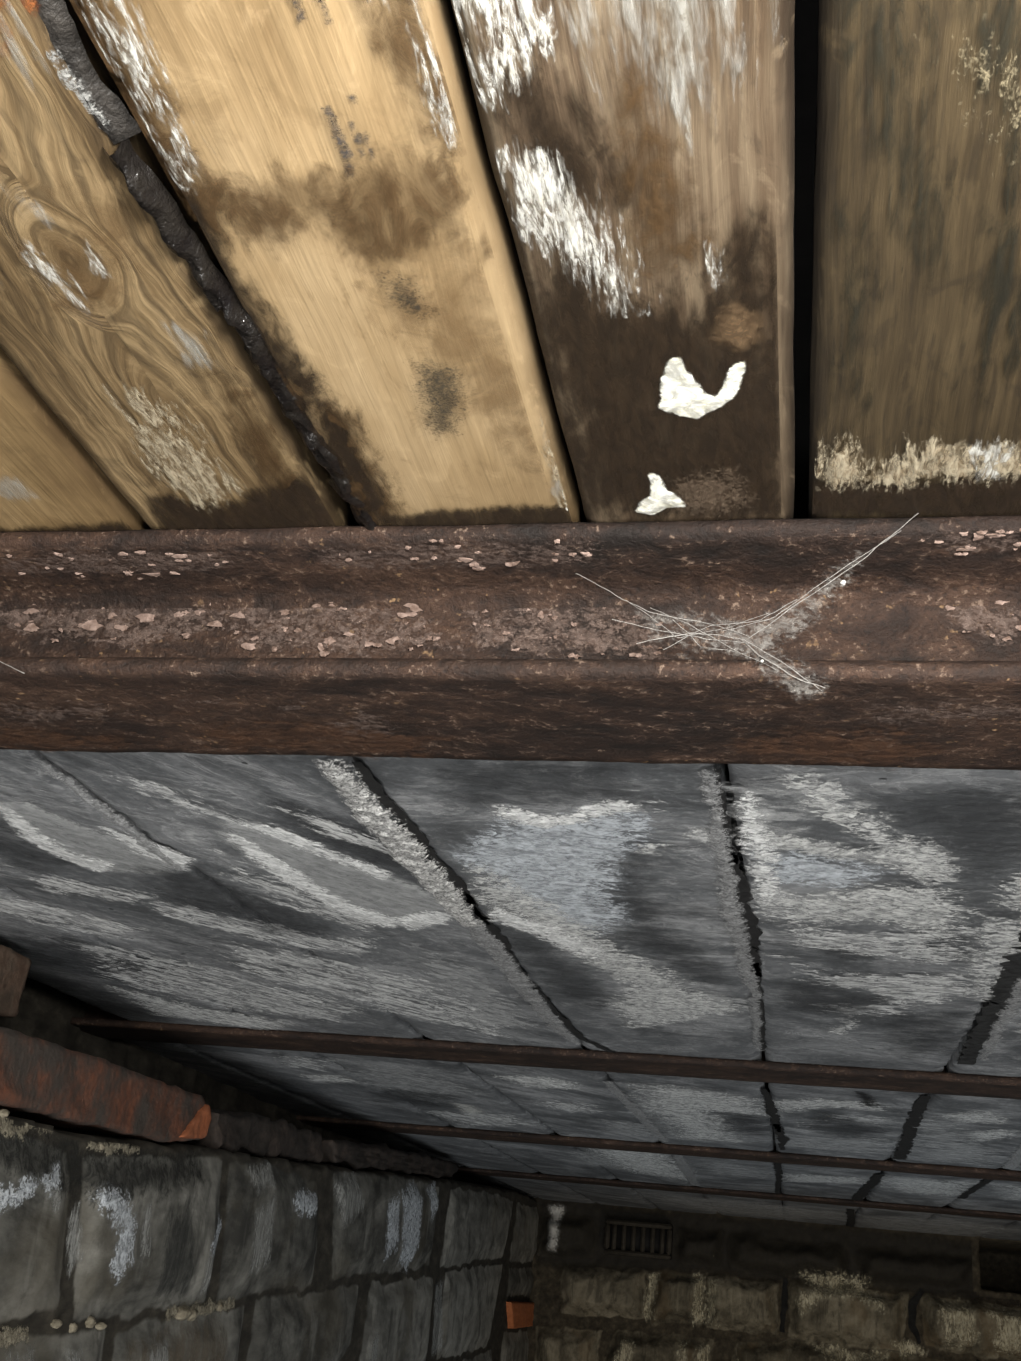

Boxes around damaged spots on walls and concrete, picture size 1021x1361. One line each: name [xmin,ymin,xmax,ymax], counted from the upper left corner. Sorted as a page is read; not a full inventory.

damp [69,0,781,530]
rust [4,545,231,580]
rust [321,539,595,571]
damp [812,473,1021,518]
rust [921,528,1021,557]
rust [0,602,663,660]
damp [0,777,533,1037]
crack [352,762,617,1053]
damp [443,766,747,1028]
crack [713,768,767,1051]
crack [957,932,1021,1065]
crack [846,1095,931,1227]